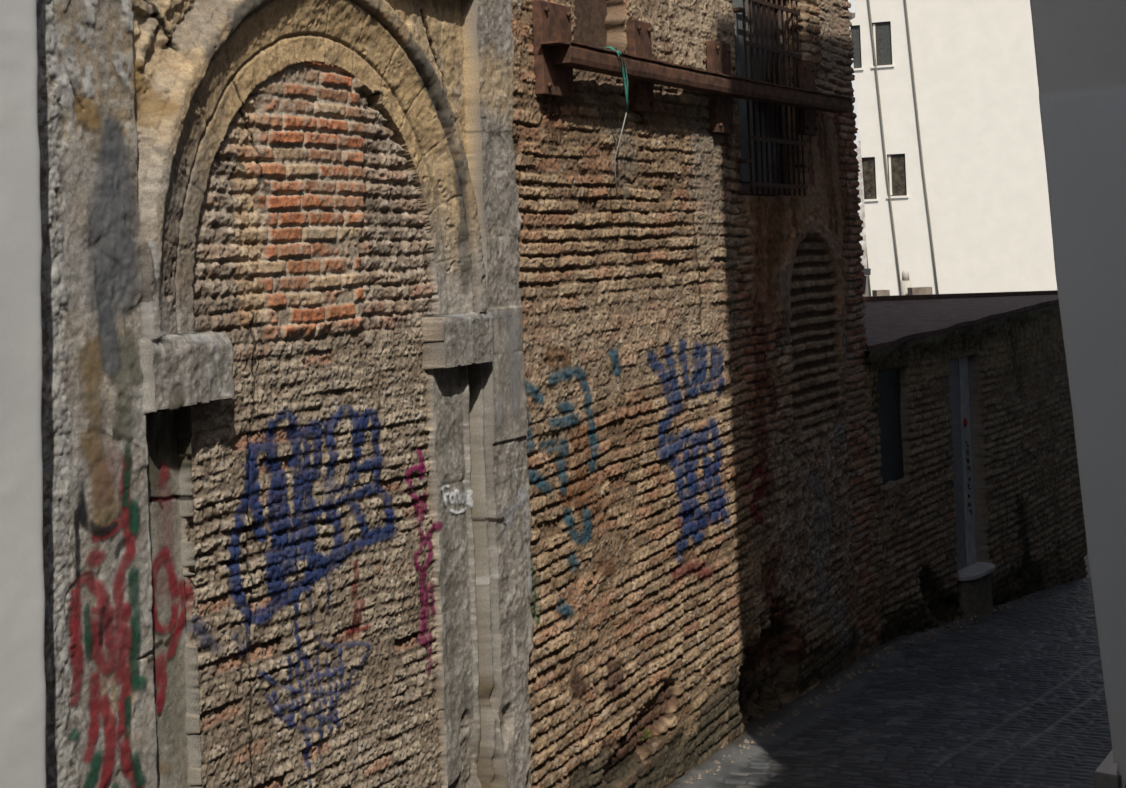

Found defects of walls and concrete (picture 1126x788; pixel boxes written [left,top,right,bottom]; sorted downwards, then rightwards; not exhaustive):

crack [143,0,178,50]
crack [246,312,257,474]
damp [992,497,1042,605]
crack [236,507,261,788]
damp [877,570,964,645]